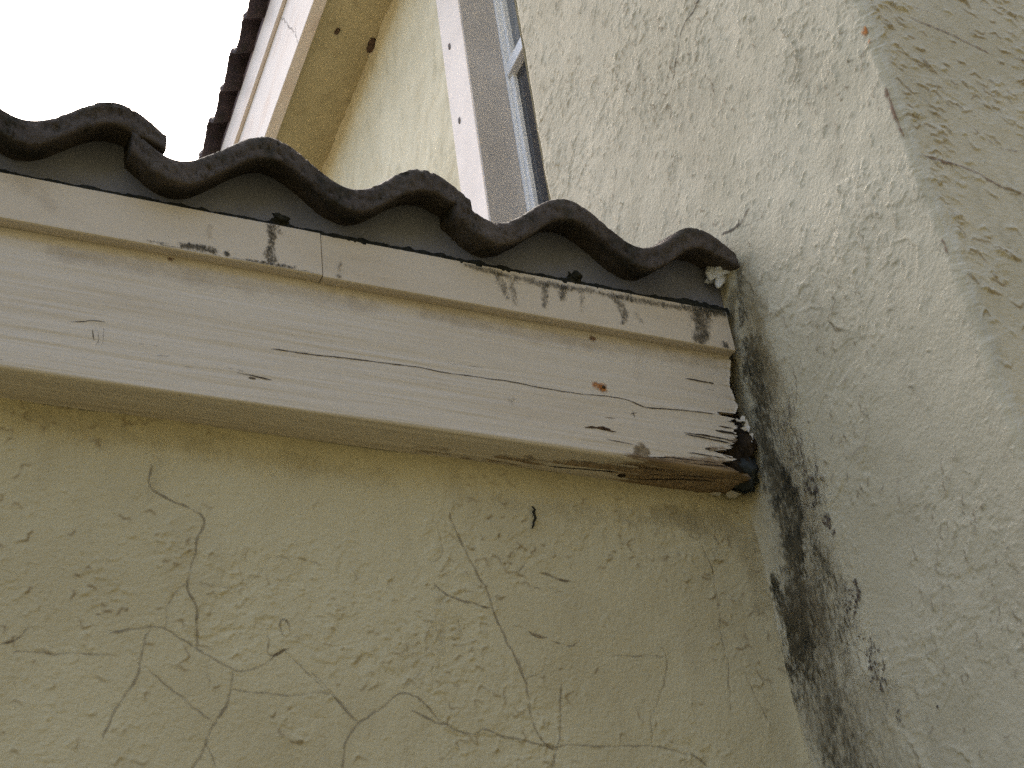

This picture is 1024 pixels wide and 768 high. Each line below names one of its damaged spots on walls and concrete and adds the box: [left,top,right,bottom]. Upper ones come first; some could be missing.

water stain [160,223,313,273]
crack [276,349,735,482]
peeling [735,416,753,442]
water stain [465,264,891,768]
crack [434,571,505,636]